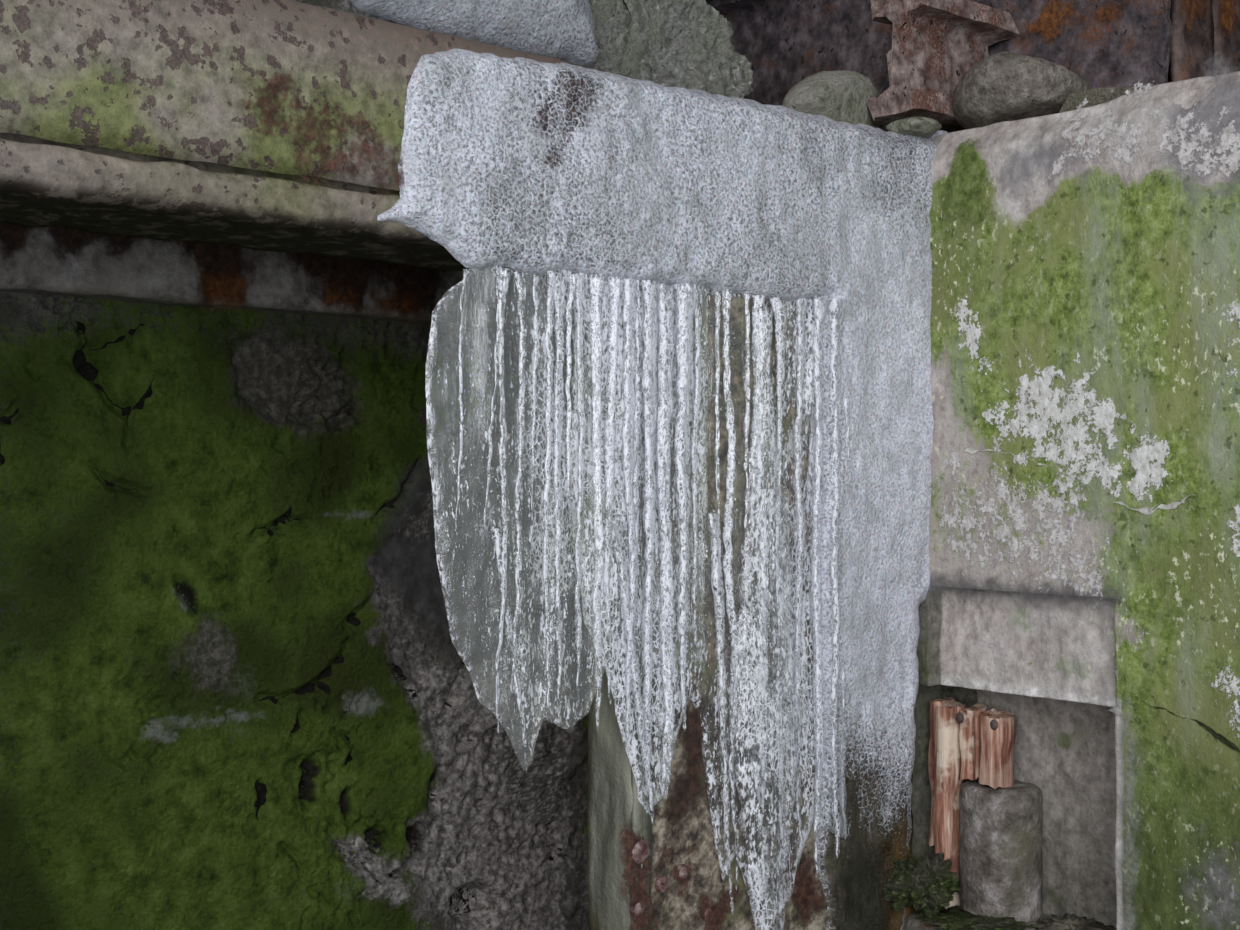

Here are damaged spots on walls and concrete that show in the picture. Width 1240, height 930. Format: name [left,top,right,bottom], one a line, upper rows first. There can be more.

rust [1023,0,1121,41]
rust [242,72,404,189]
leakage [1001,70,1240,193]
crack [73,320,154,432]
crack [250,506,300,543]
crack [375,460,418,516]
efflorescence [939,451,1103,612]
crack [258,600,368,733]
crack [391,661,465,710]
crack [1129,695,1240,752]
spalling [335,659,579,930]